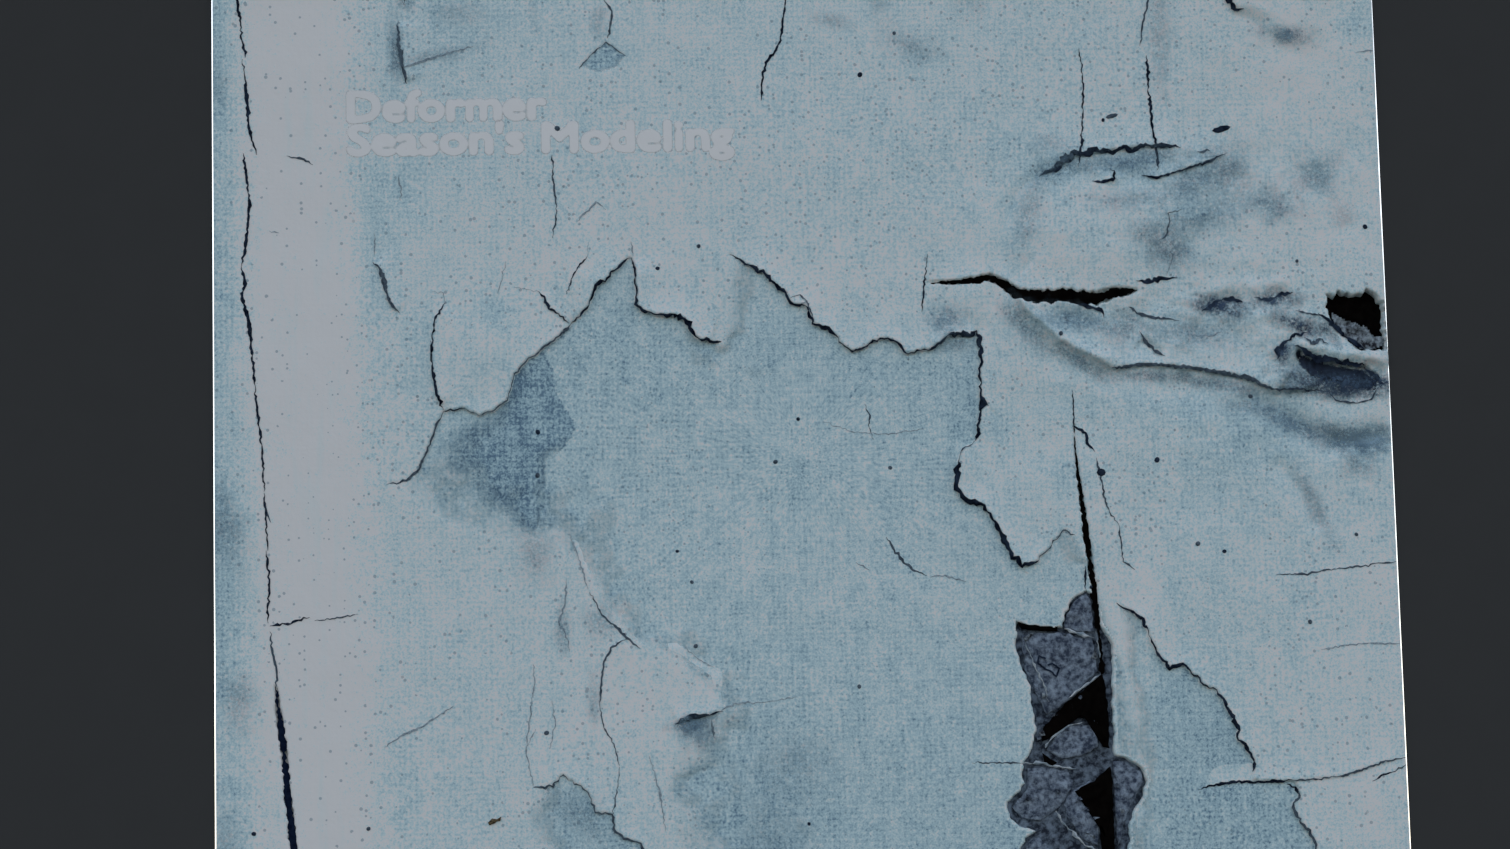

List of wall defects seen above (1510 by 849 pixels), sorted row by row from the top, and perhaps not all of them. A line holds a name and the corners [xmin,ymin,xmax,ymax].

crack [236,0,356,849]
peeling [389,254,1317,849]
crack [1072,391,1135,676]
crack [921,0,1321,392]